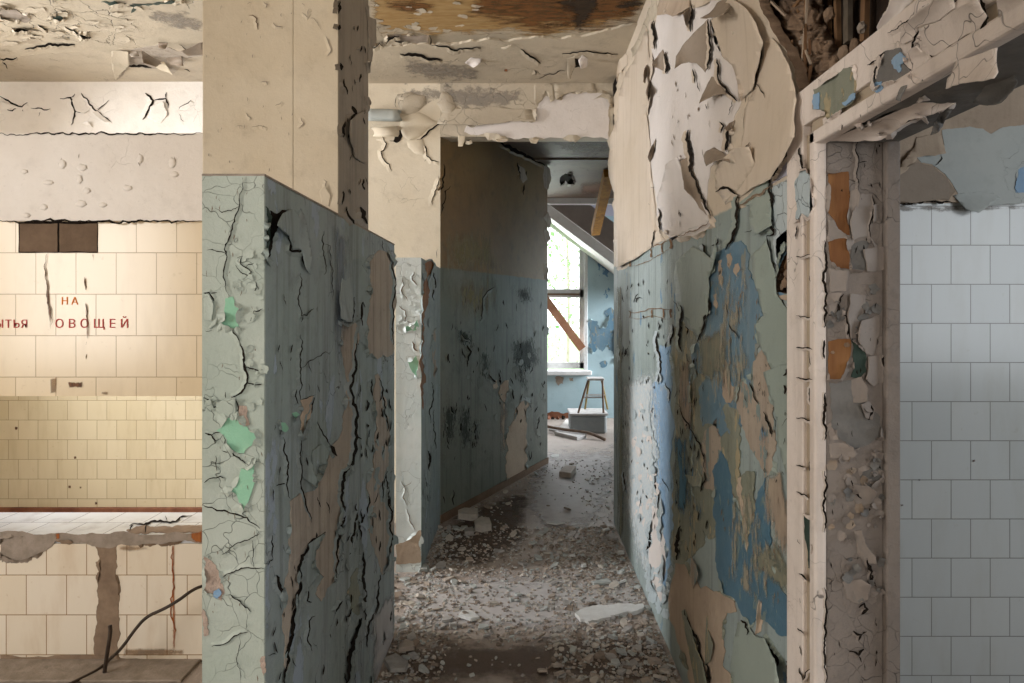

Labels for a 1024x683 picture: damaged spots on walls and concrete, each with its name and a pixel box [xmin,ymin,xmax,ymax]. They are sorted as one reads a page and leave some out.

crack [0,93,110,126]
flaking render [0,0,203,81]
water stain [373,0,643,36]
peeling [831,0,1024,213]
crack [130,0,545,683]
water stain [511,337,539,390]
peeling [397,0,886,683]
peeling [277,250,440,672]
spalling [0,525,225,659]
corrosion [125,547,182,654]